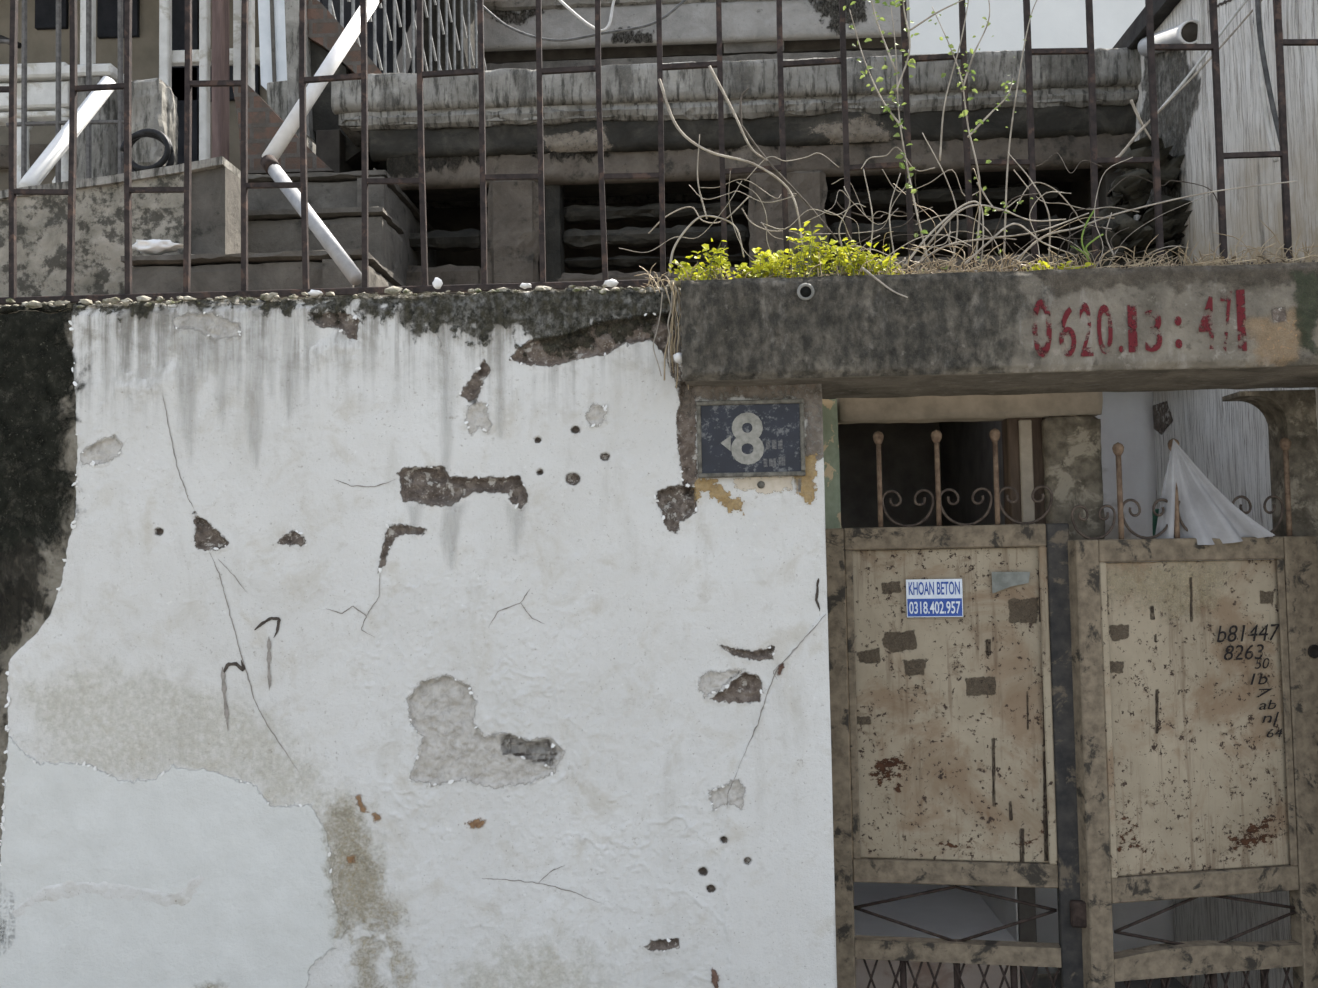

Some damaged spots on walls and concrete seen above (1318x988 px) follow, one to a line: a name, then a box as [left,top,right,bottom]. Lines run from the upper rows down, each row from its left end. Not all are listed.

water stain [0,304,85,650]
crack [162,395,195,511]
spalling [192,511,229,551]
spalling [378,524,427,573]
spalling [397,465,528,509]
spalling [509,312,818,534]
water stain [678,271,1020,460]
water stain [1035,262,1318,362]
crack [209,552,300,775]
spalling [407,675,564,789]
spalling [698,645,775,704]
crack [727,578,826,805]